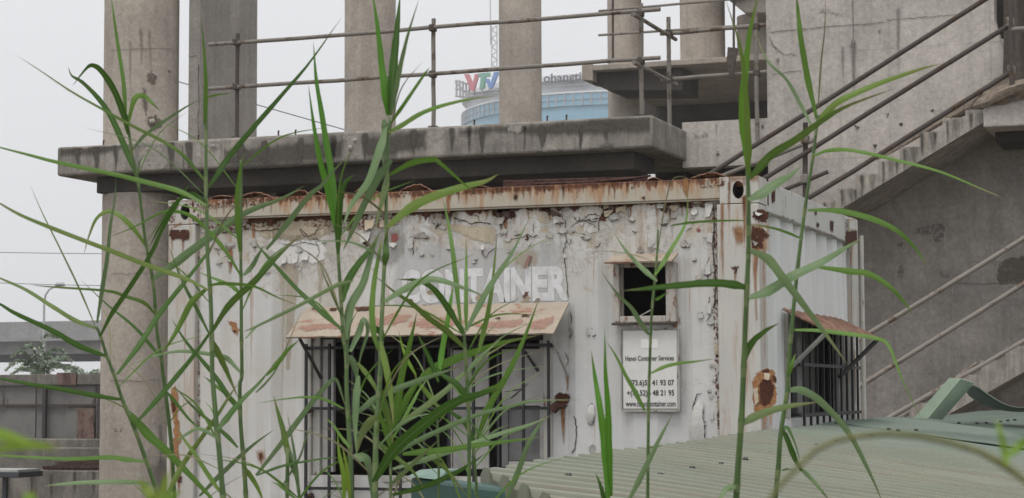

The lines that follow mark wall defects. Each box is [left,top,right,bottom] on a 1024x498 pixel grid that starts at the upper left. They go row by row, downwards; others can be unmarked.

peeling [200,217,334,275]
peeling [360,217,535,269]
rust [168,177,795,292]
peeling [546,213,636,295]
peeling [681,201,718,326]
rust [170,386,182,488]
rust [554,377,571,438]
rust [752,368,778,429]